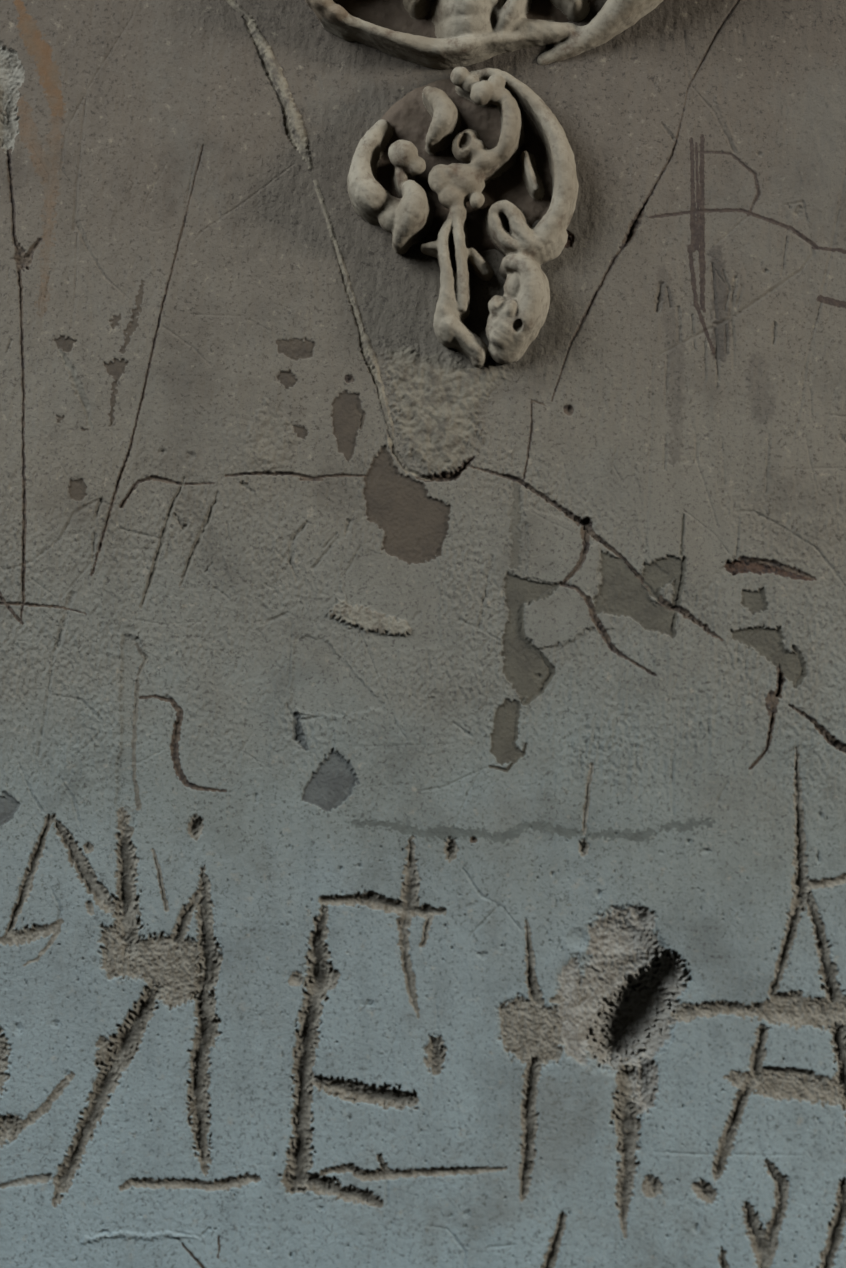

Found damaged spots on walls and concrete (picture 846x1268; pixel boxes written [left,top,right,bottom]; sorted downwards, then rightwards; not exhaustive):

peeling [329,373,367,465]
spalling [362,334,514,566]
peeling [488,477,561,774]
peeling [592,514,688,640]
peeling [729,585,808,689]
peeling [0,789,21,827]
peeling [291,710,361,813]
crack [748,666,846,771]
crack [180,1235,221,1268]